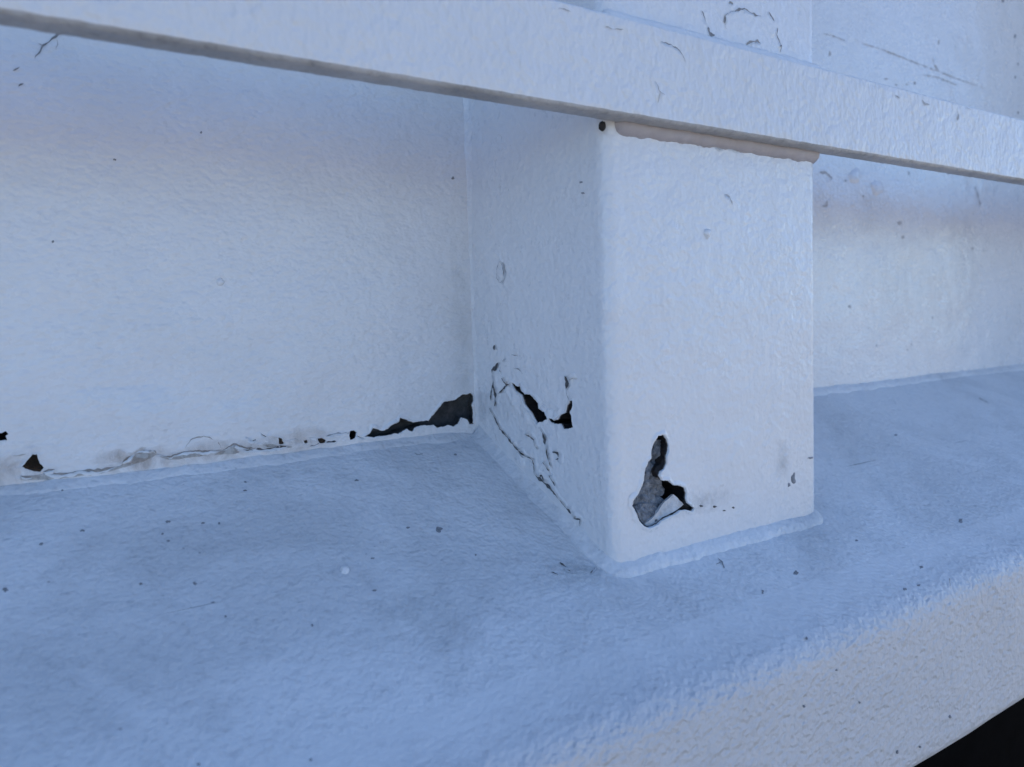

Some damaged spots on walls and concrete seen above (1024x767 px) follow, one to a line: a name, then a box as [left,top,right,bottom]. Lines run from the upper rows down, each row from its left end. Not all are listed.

spalling [348,391,476,441]
crack [489,345,583,526]
peeling [509,378,574,432]
peeling [13,436,257,491]
peeling [628,430,735,533]